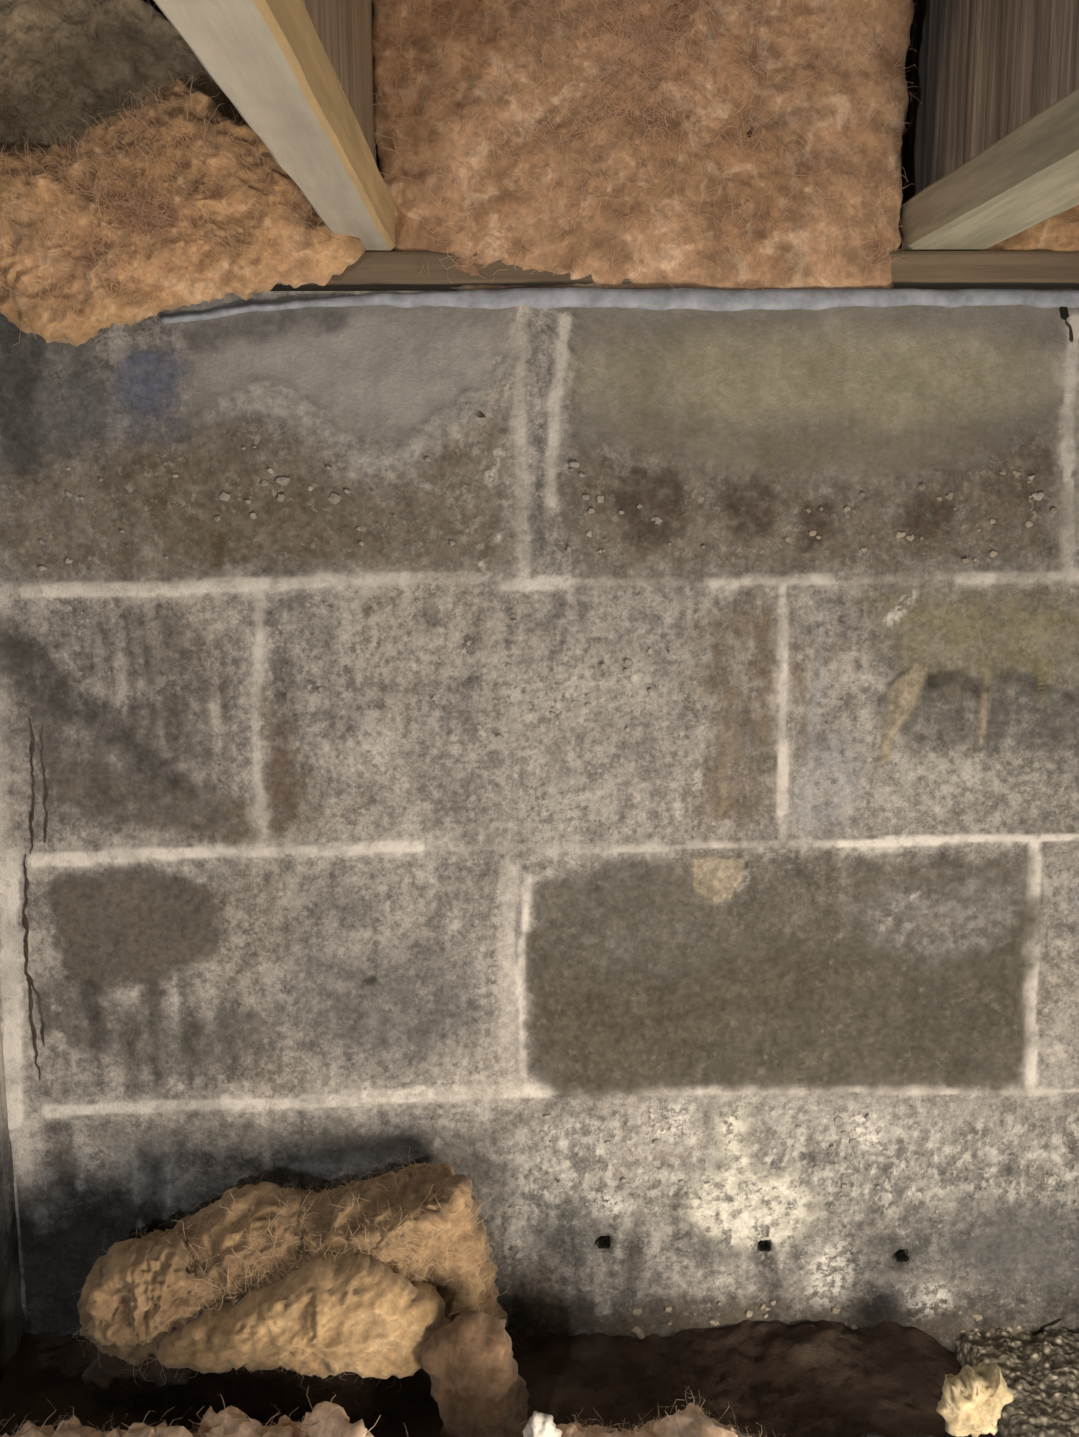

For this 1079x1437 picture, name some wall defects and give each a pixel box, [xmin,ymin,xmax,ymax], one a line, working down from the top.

leakage [0,313,106,469]
leakage [194,348,530,473]
leakage [135,459,351,566]
leakage [486,439,534,510]
leakage [881,590,1079,764]
leakage [40,871,264,1071]
leakage [324,1016,510,1104]
leakage [497,856,1079,1285]
leakage [806,1241,855,1304]
leakage [891,1279,951,1318]